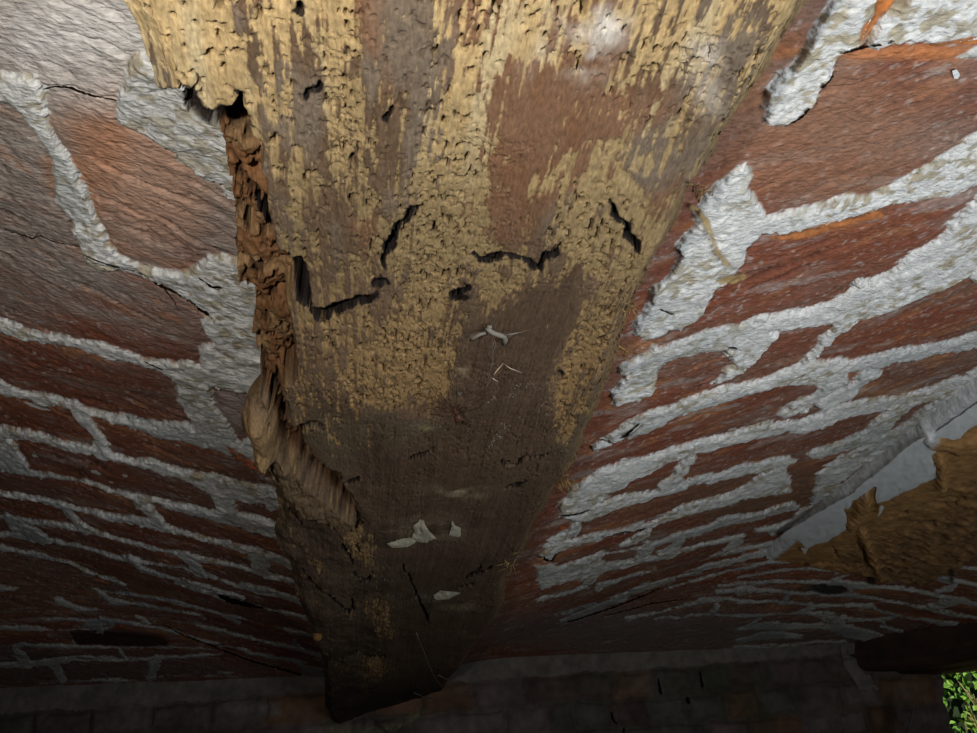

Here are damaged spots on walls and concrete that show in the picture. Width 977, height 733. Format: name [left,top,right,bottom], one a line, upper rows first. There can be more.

crack [1,228,222,319]
peeling [781,404,977,555]